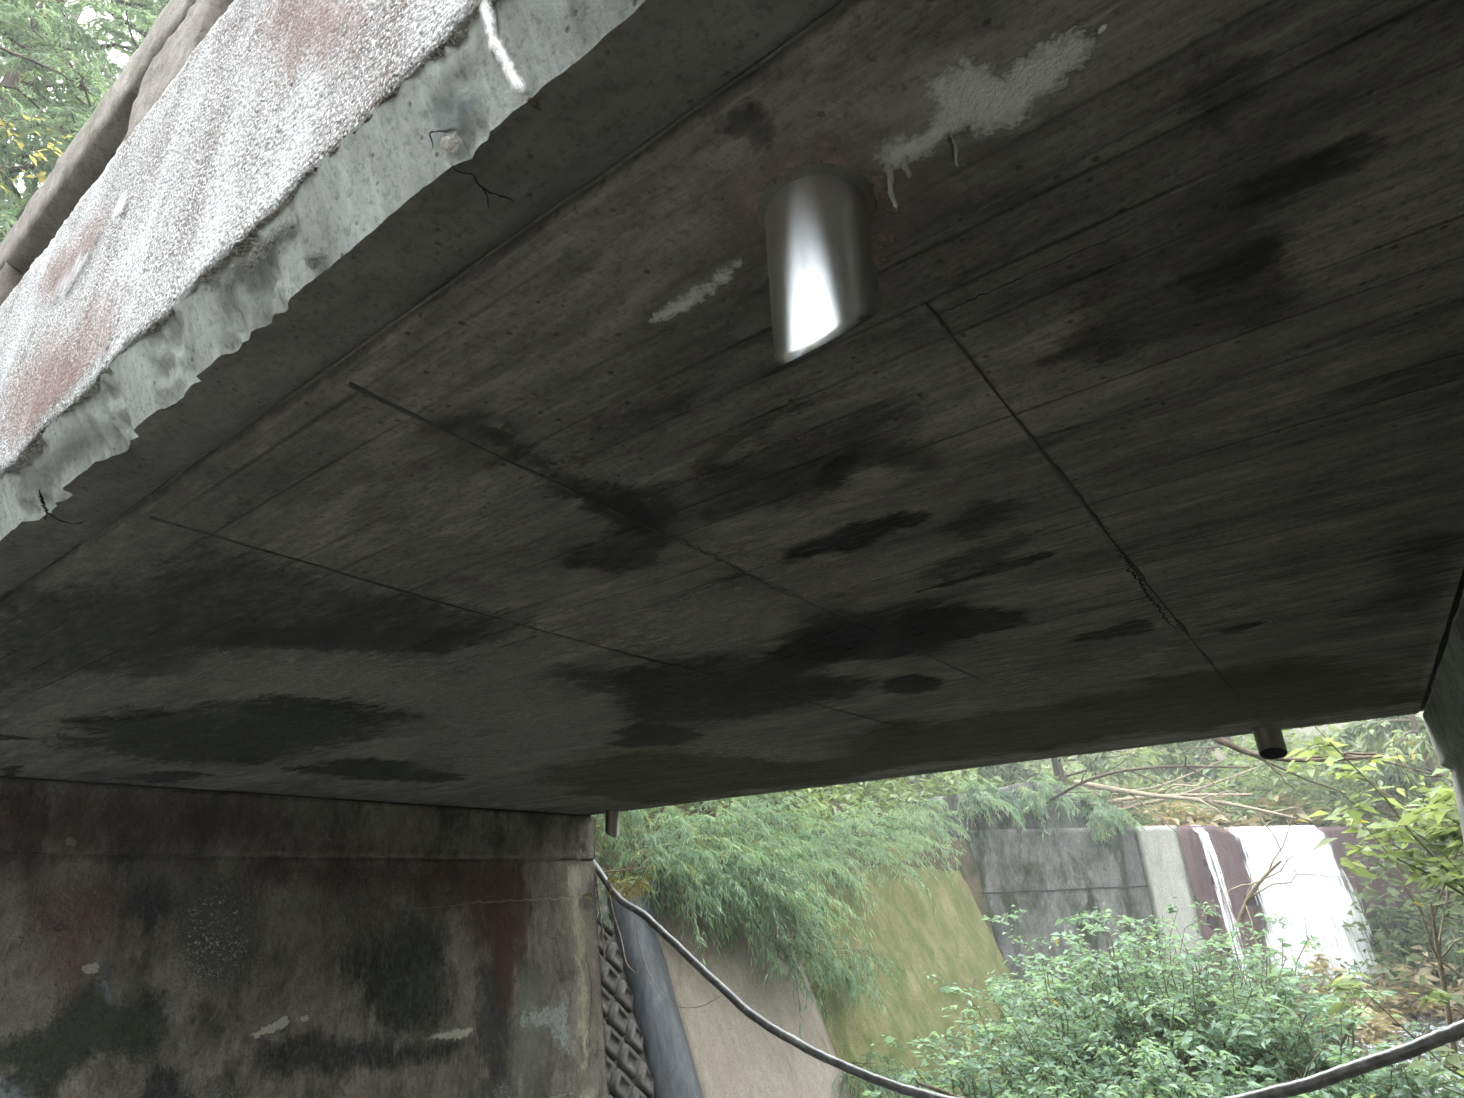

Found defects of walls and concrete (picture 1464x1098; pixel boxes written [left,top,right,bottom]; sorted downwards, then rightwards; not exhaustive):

spalling [440,133,461,155]
damp [713,24,1108,275]
damp [650,260,742,323]
damp [442,396,941,575]
damp [537,499,1056,748]
damp [253,912,514,1098]